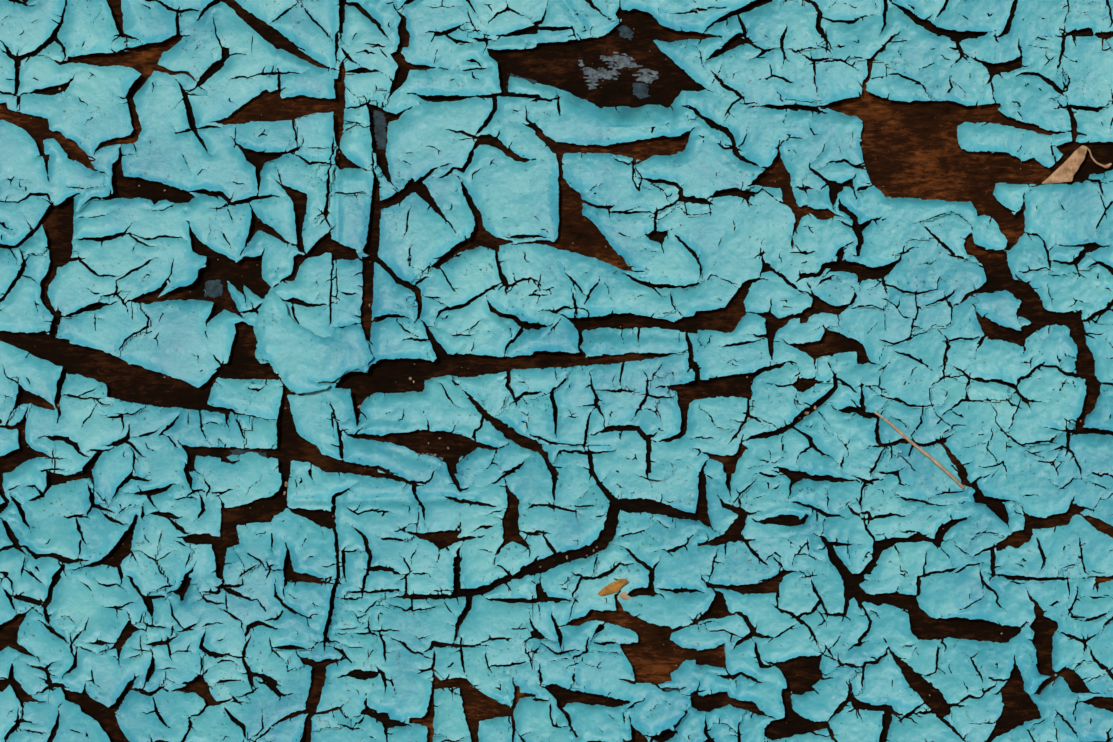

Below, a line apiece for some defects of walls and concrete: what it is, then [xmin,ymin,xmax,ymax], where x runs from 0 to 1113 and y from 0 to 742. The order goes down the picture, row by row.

peeling [0,0,302,319]
peeling [159,0,536,345]
peeling [483,0,773,113]
peeling [0,127,887,600]
crack [0,180,1113,742]
peeling [409,434,903,742]
peeling [796,0,1113,742]